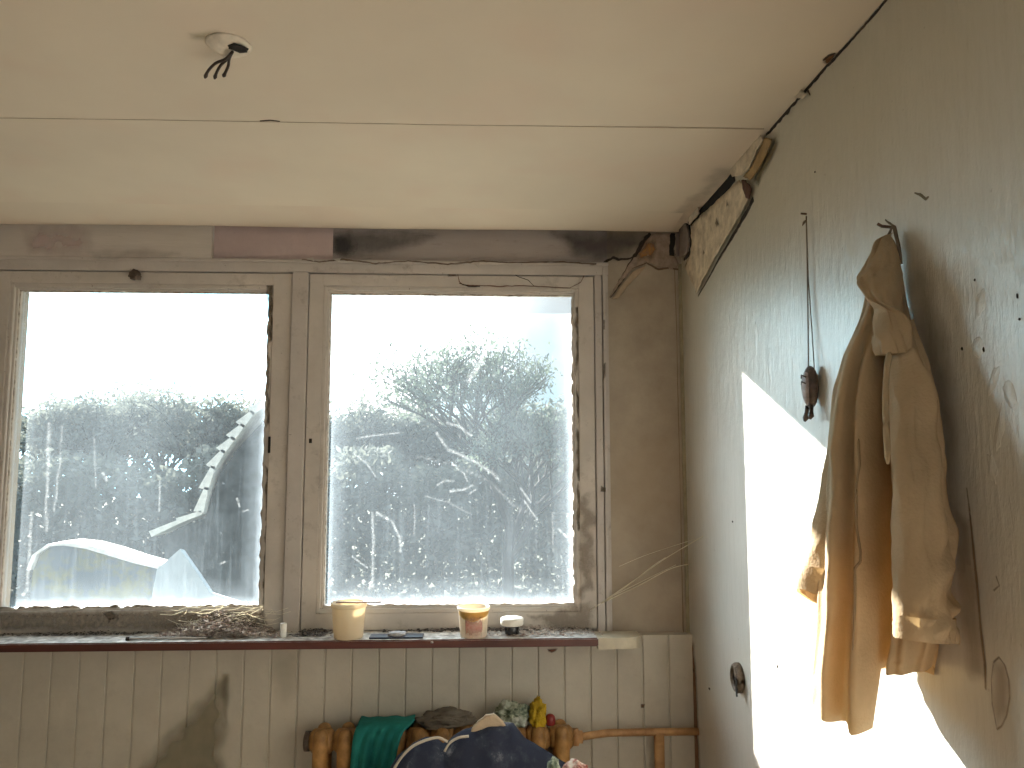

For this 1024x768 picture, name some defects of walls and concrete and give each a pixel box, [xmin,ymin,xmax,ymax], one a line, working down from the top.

peeling [675,135,777,261]
crack [302,240,645,288]
damp [152,686,220,768]